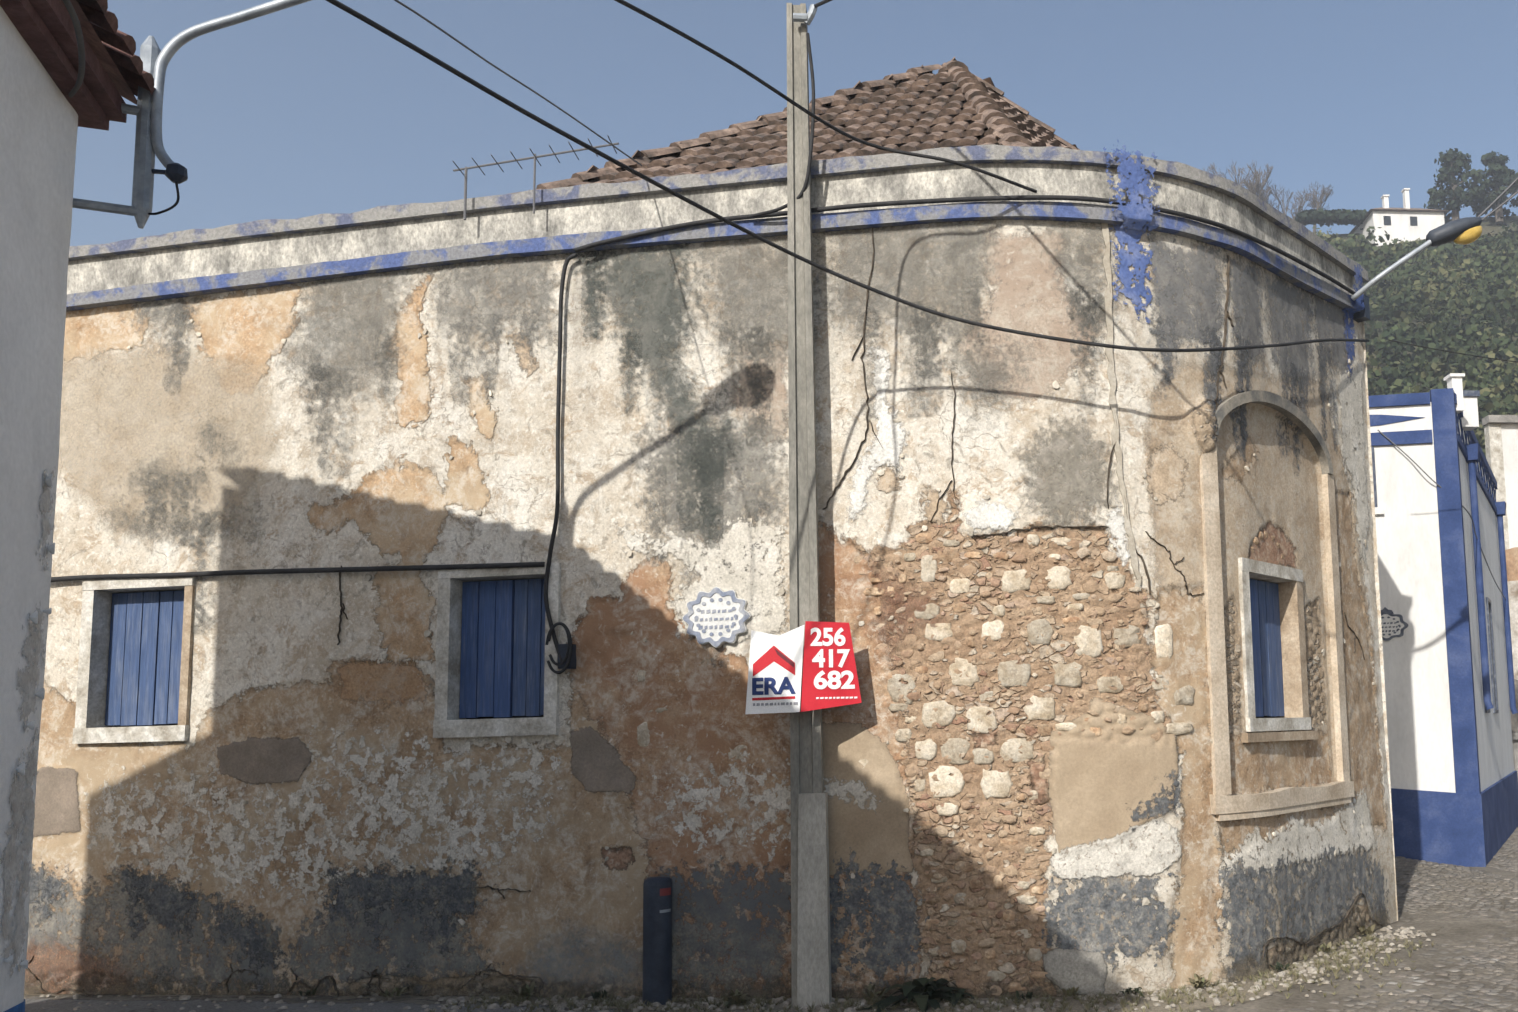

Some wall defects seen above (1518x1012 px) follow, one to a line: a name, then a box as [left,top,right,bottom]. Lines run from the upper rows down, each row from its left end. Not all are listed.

damp [293,270,411,475]
flaking render [384,274,435,429]
damp [575,238,789,590]
crack [822,227,884,510]
crack [930,373,956,522]
crack [972,223,1203,596]
peeling [1103,140,1160,323]
damp [1143,233,1350,480]
crack [337,566,348,645]
flaking render [1,372,792,998]
flaking render [818,365,1388,998]
damp [1222,902,1390,981]